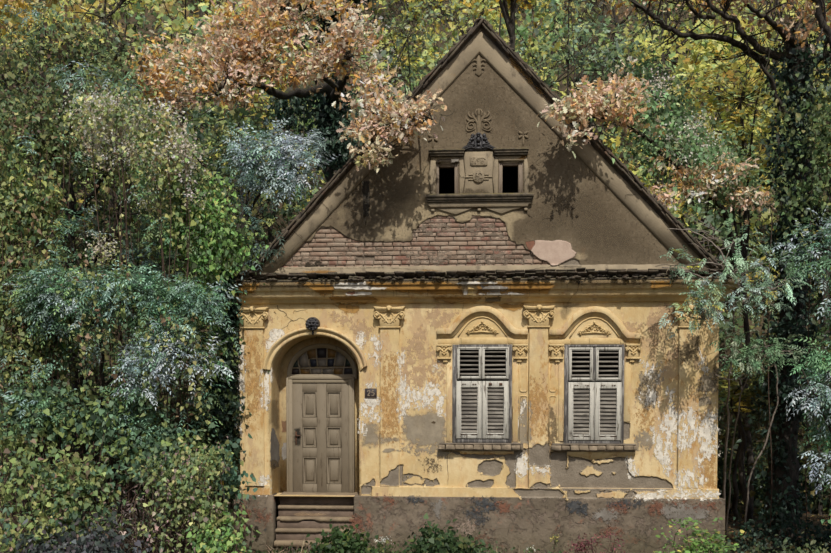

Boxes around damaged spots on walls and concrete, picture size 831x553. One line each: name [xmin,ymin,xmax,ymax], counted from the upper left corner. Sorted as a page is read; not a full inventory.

flaking render [281,215,581,271]
peeling [333,281,385,296]
spalling [457,281,525,295]
peeling [266,329,285,352]
peeling [356,332,382,367]
peeling [260,368,273,411]
peeling [357,383,382,436]
peeling [396,350,446,423]
spalling [449,356,721,547]